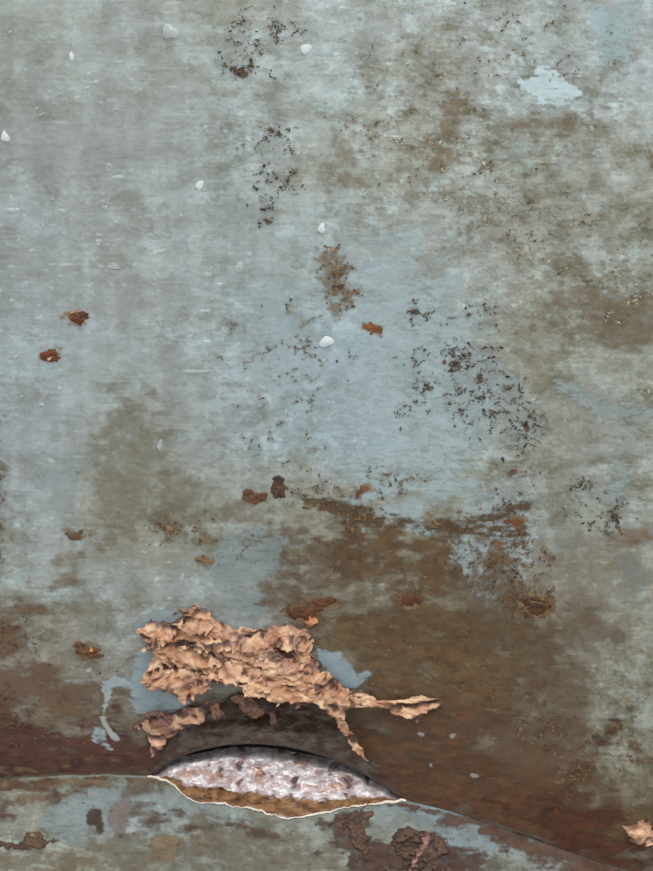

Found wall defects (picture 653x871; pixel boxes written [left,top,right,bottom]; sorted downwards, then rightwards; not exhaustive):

corrosion [436,161,602,260]
corrosion [0,243,653,871]
peeling [92,647,191,750]
peeling [132,608,189,630]
peeling [317,649,371,688]